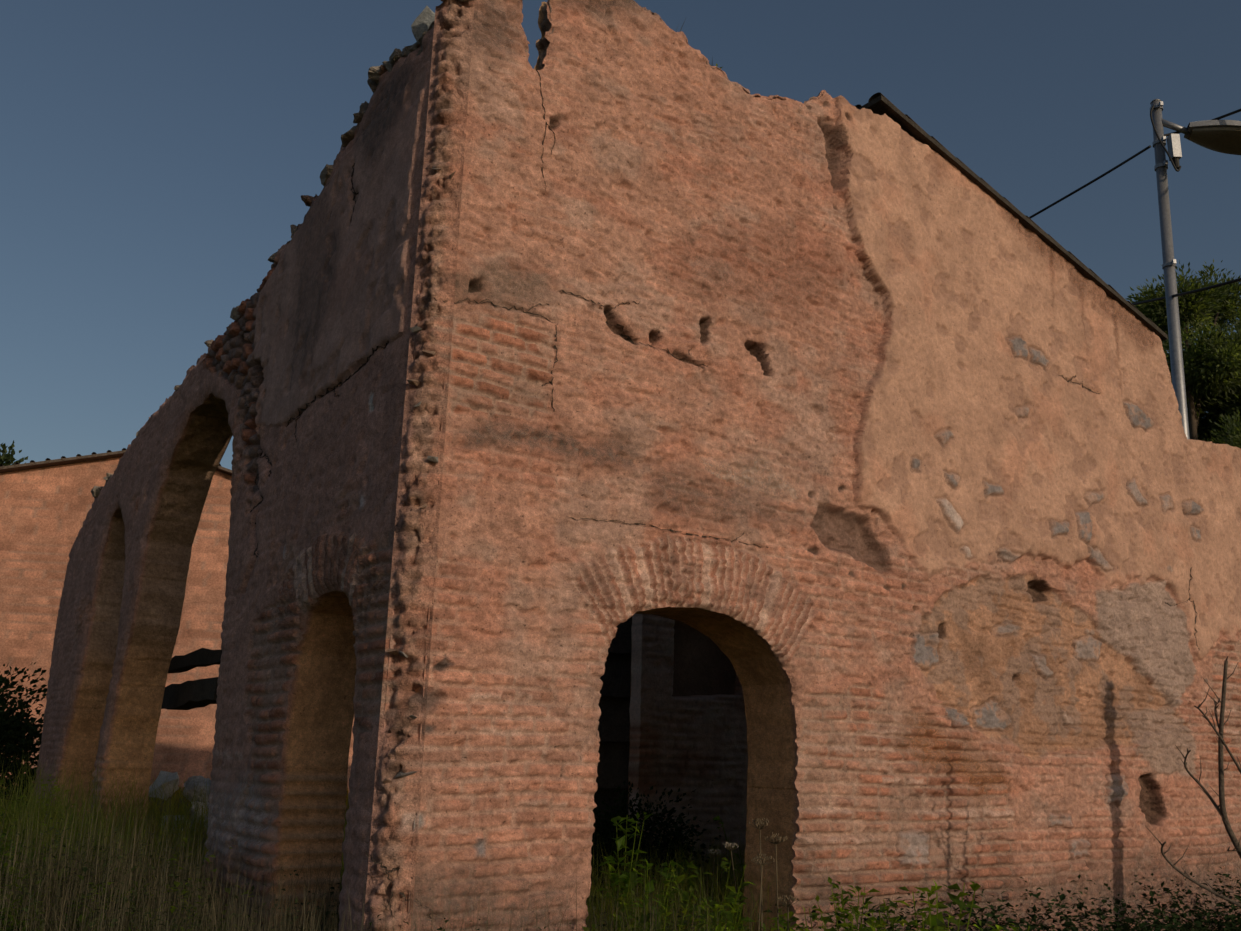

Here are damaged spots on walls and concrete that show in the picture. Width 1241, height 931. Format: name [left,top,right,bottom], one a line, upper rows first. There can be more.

crack [536,69,556,196]
crack [434,290,708,411]
spalling [603,304,663,346]
spalling [672,348,705,369]
spalling [699,317,712,345]
spalling [744,340,773,376]
crack [286,341,389,442]
crack [250,449,272,557]
crack [570,517,768,548]